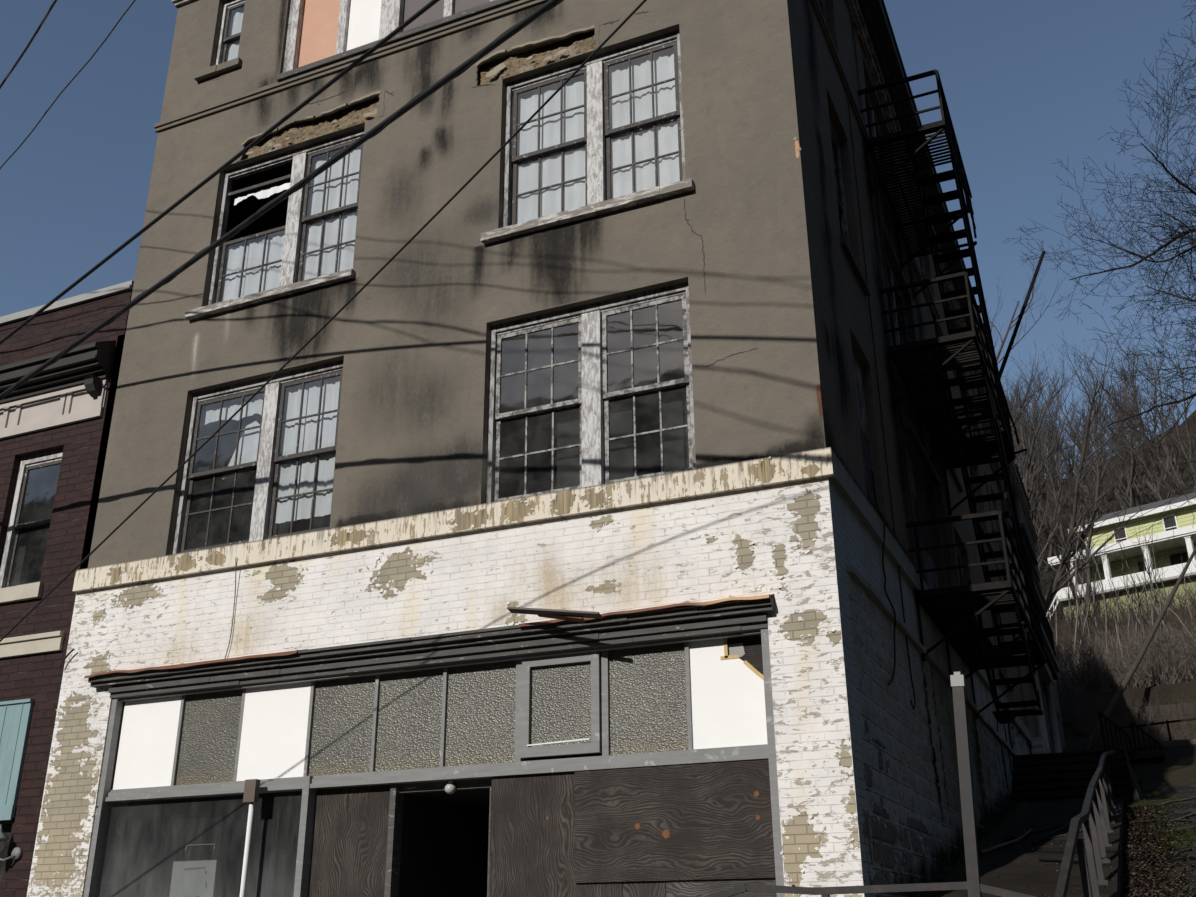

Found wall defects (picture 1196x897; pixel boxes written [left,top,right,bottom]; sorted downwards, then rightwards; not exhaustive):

peeling [752,456,784,483]
peeling [323,529,374,547]
peeling [446,497,535,531]
peeling [550,486,620,531]
peeling [733,534,755,574]
peeling [771,464,824,593]